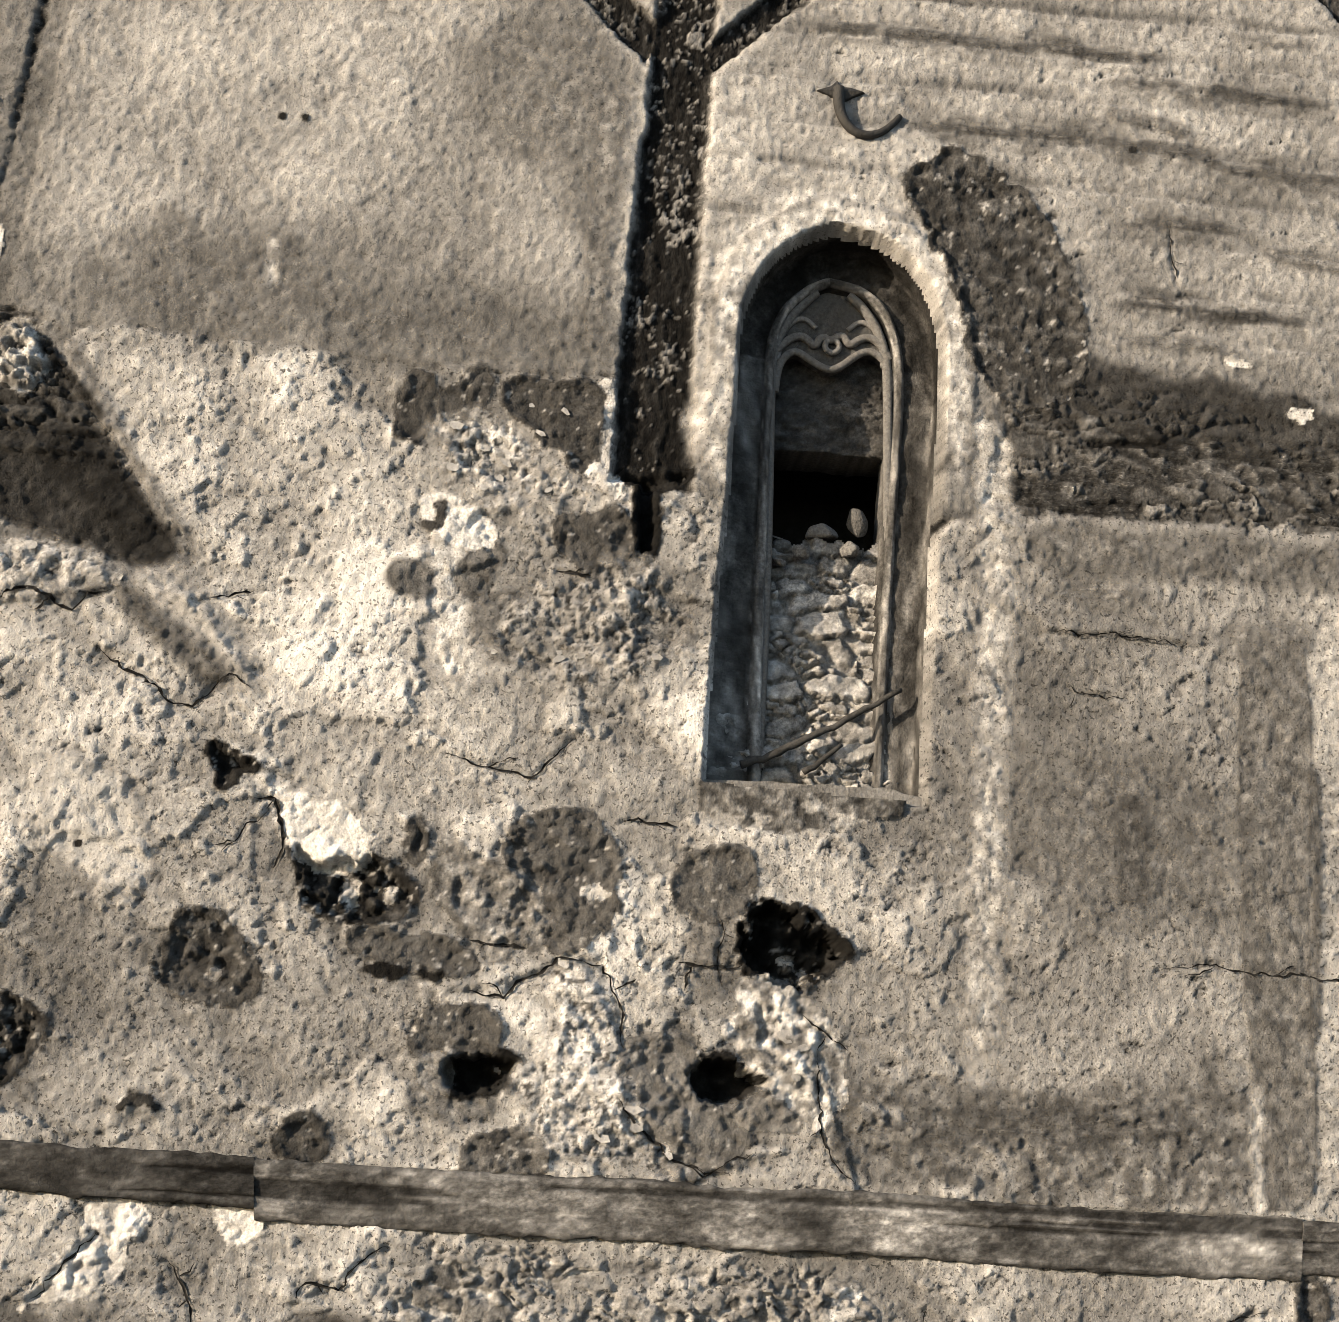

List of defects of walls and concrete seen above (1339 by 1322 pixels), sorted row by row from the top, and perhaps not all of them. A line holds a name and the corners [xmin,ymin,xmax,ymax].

spalling [901,145,1090,419]
flaking render [392,363,699,689]
crack [0,585,111,611]
crack [99,648,253,707]
spalling [202,738,261,791]
crack [446,738,574,784]
spalling [150,905,262,1008]
flaking render [270,791,856,1184]
crack [1158,964,1339,982]
spalling [0,988,51,1087]
crack [803,1015,857,1186]
crack [168,1261,195,1322]